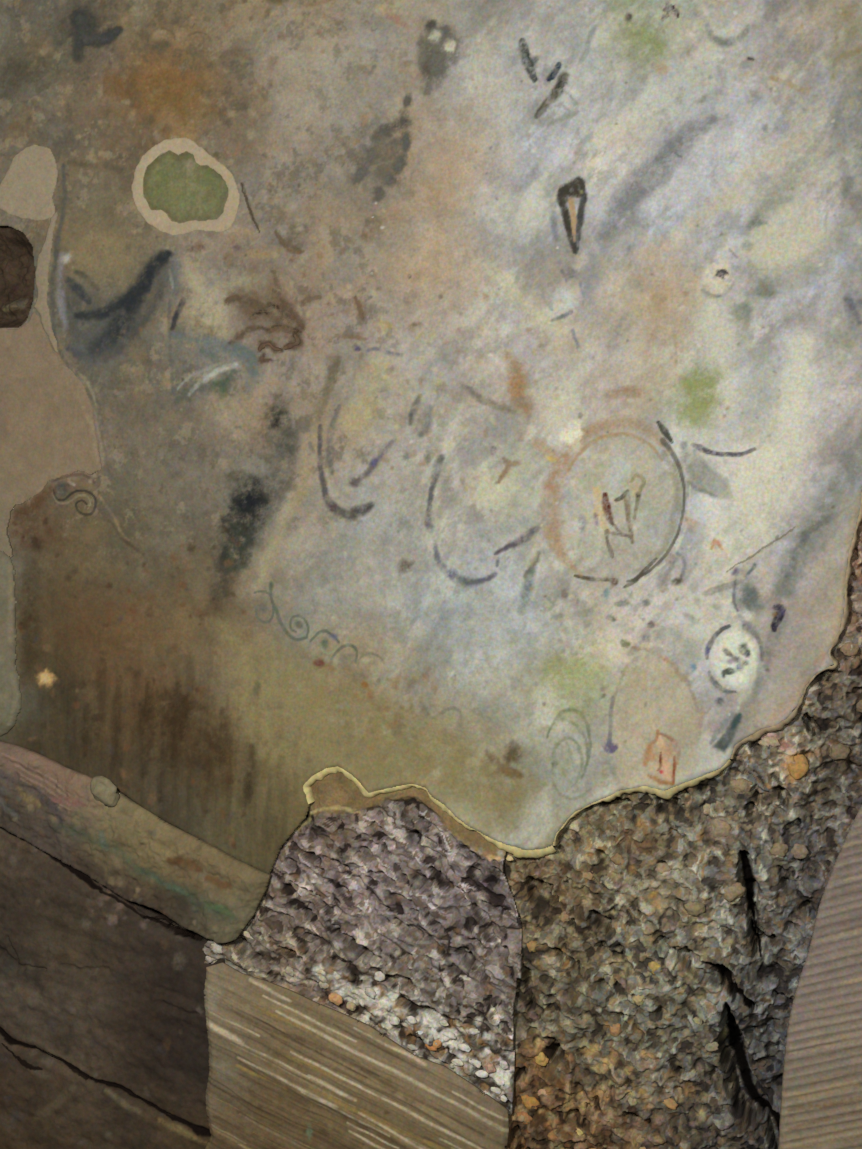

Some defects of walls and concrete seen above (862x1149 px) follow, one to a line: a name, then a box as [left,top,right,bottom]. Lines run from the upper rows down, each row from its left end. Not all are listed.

leakage [145,151,228,221]
spalling [202,493,862,1149]
crack [47,853,201,940]
crack [739,850,762,957]
crack [0,1027,211,1136]
crack [712,963,780,1131]